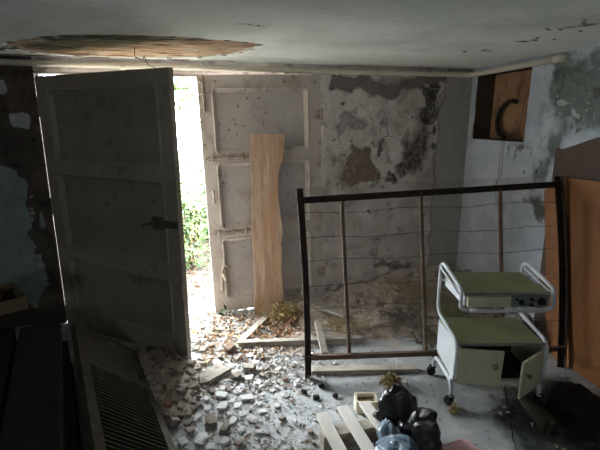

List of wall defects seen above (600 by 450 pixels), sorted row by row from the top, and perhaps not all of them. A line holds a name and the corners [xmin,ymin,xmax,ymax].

flaking render [9,112,31,129]
flaking render [336,136,385,190]
leakage [329,74,447,184]
flaking render [0,165,50,309]